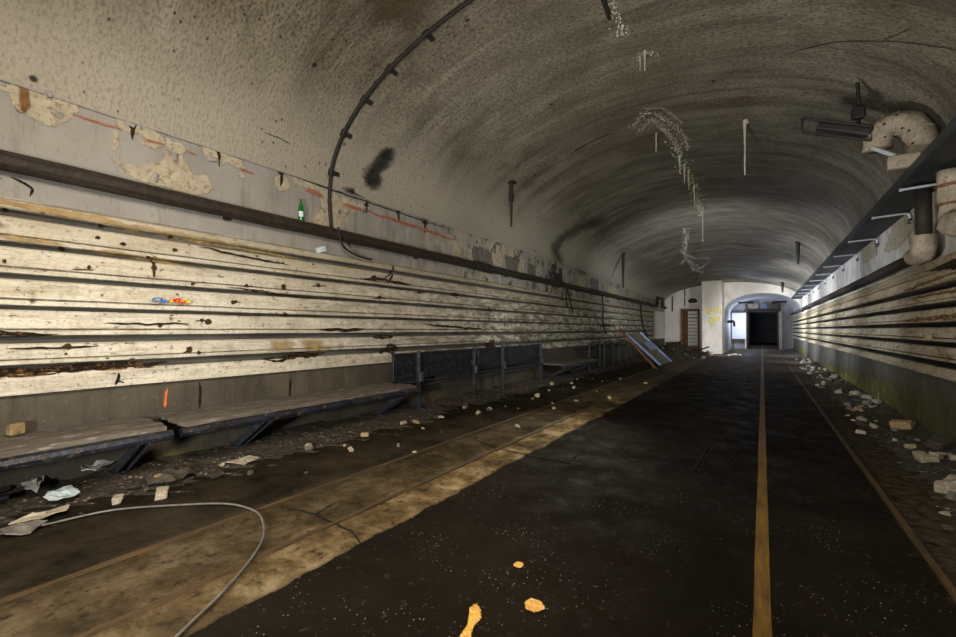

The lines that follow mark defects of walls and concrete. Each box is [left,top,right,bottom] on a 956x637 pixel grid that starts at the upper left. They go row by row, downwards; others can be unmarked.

water stain [601,0,629,37]
peeling [0,84,79,127]
peeling [112,118,213,195]
peeling [202,147,245,178]
water stain [629,107,705,242]
peeling [446,234,536,276]
water stain [680,228,711,274]